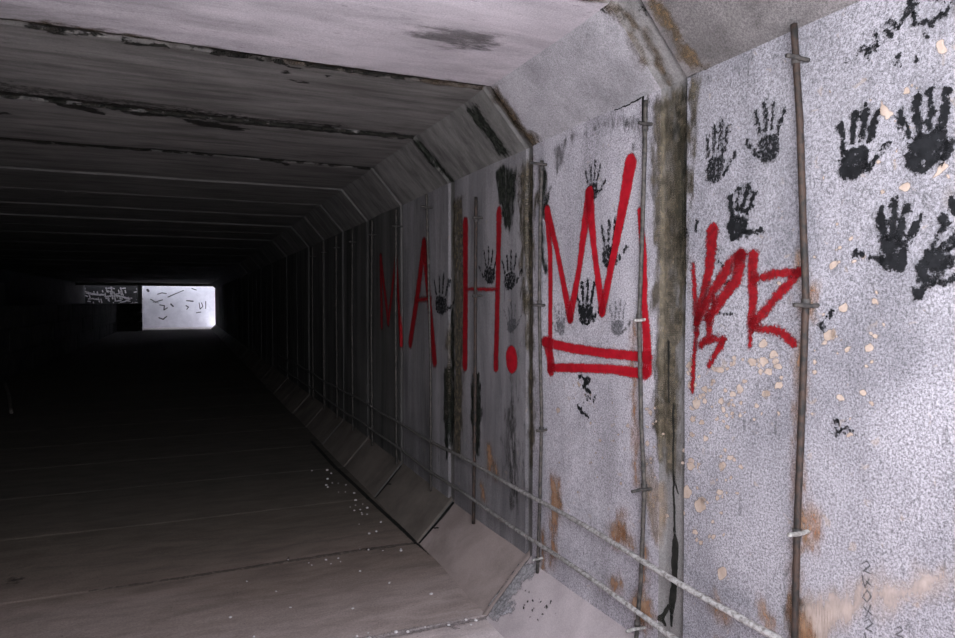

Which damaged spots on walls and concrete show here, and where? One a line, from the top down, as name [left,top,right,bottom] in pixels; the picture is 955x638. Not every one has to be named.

leakage [75,27,181,44]
leakage [413,140,454,182]
leakage [386,72,540,146]
leakage [443,197,483,459]
leakage [466,104,573,469]
leakage [604,0,703,477]